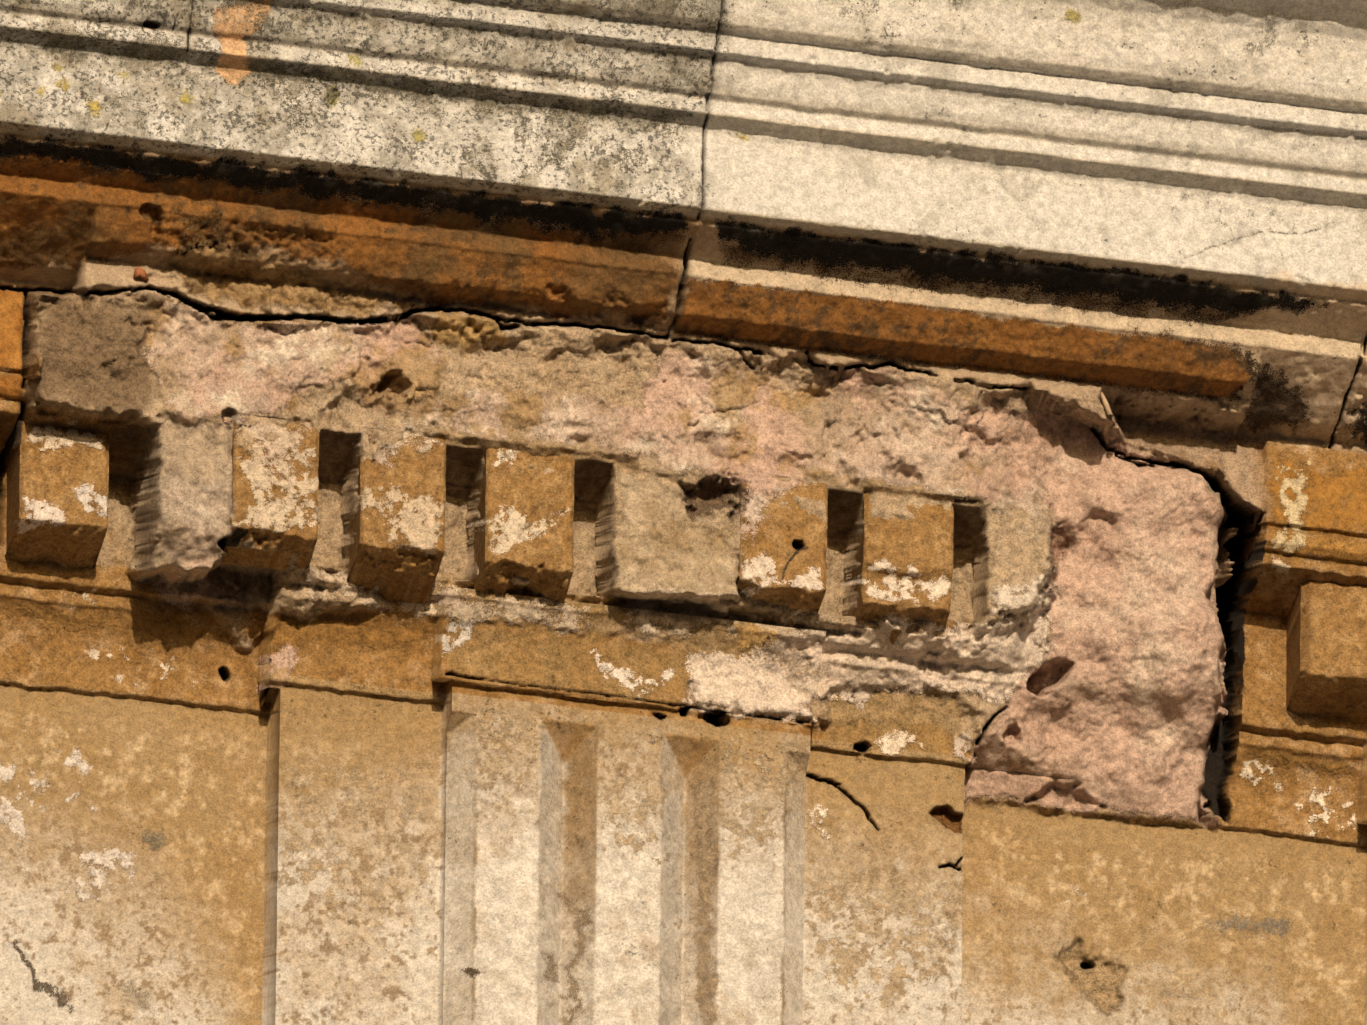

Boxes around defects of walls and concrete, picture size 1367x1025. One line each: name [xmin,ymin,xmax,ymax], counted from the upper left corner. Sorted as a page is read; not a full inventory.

corrosion [212,0,274,87]
crack [0,0,763,524]
water stain [714,216,1329,317]
peeling [4,495,66,535]
peeling [27,420,106,455]
peeling [71,482,109,518]
spalling [131,201,1234,869]
crack [805,352,1028,389]
crack [1091,428,1234,507]
water stain [1222,340,1314,439]
water stain [1344,402,1367,446]
crack [806,773,878,830]